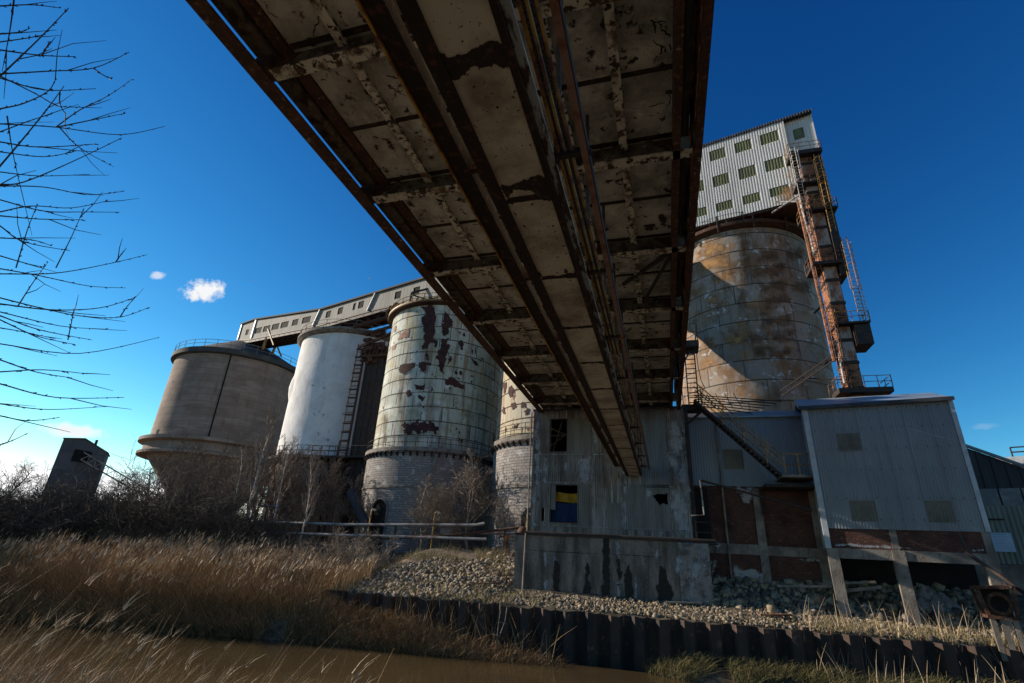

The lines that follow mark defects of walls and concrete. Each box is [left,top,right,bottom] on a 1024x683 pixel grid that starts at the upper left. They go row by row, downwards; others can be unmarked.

spalling [440,41,515,81]
peeling [399,305,479,389]
peeling [401,419,439,435]
peeling [502,382,529,428]
water stain [544,552,560,591]
water stain [583,538,637,599]